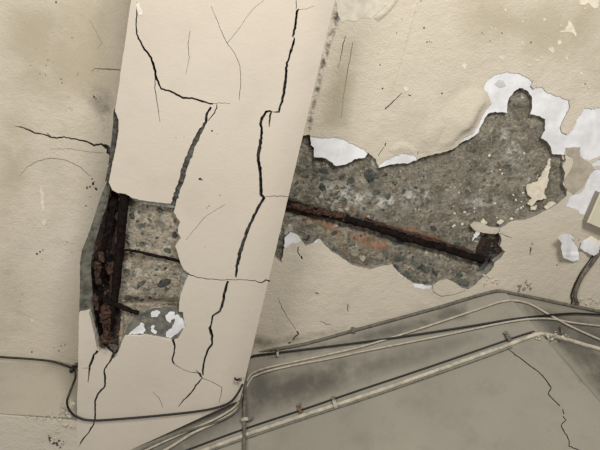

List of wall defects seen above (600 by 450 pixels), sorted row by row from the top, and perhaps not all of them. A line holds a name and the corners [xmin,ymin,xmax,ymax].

crack [15,126,110,176]
spalling [79,109,120,337]
spalling [104,197,188,354]
crack [135,1,263,207]
crack [172,1,313,407]
spalling [275,72,600,296]
crack [80,350,115,444]
crack [509,350,579,450]